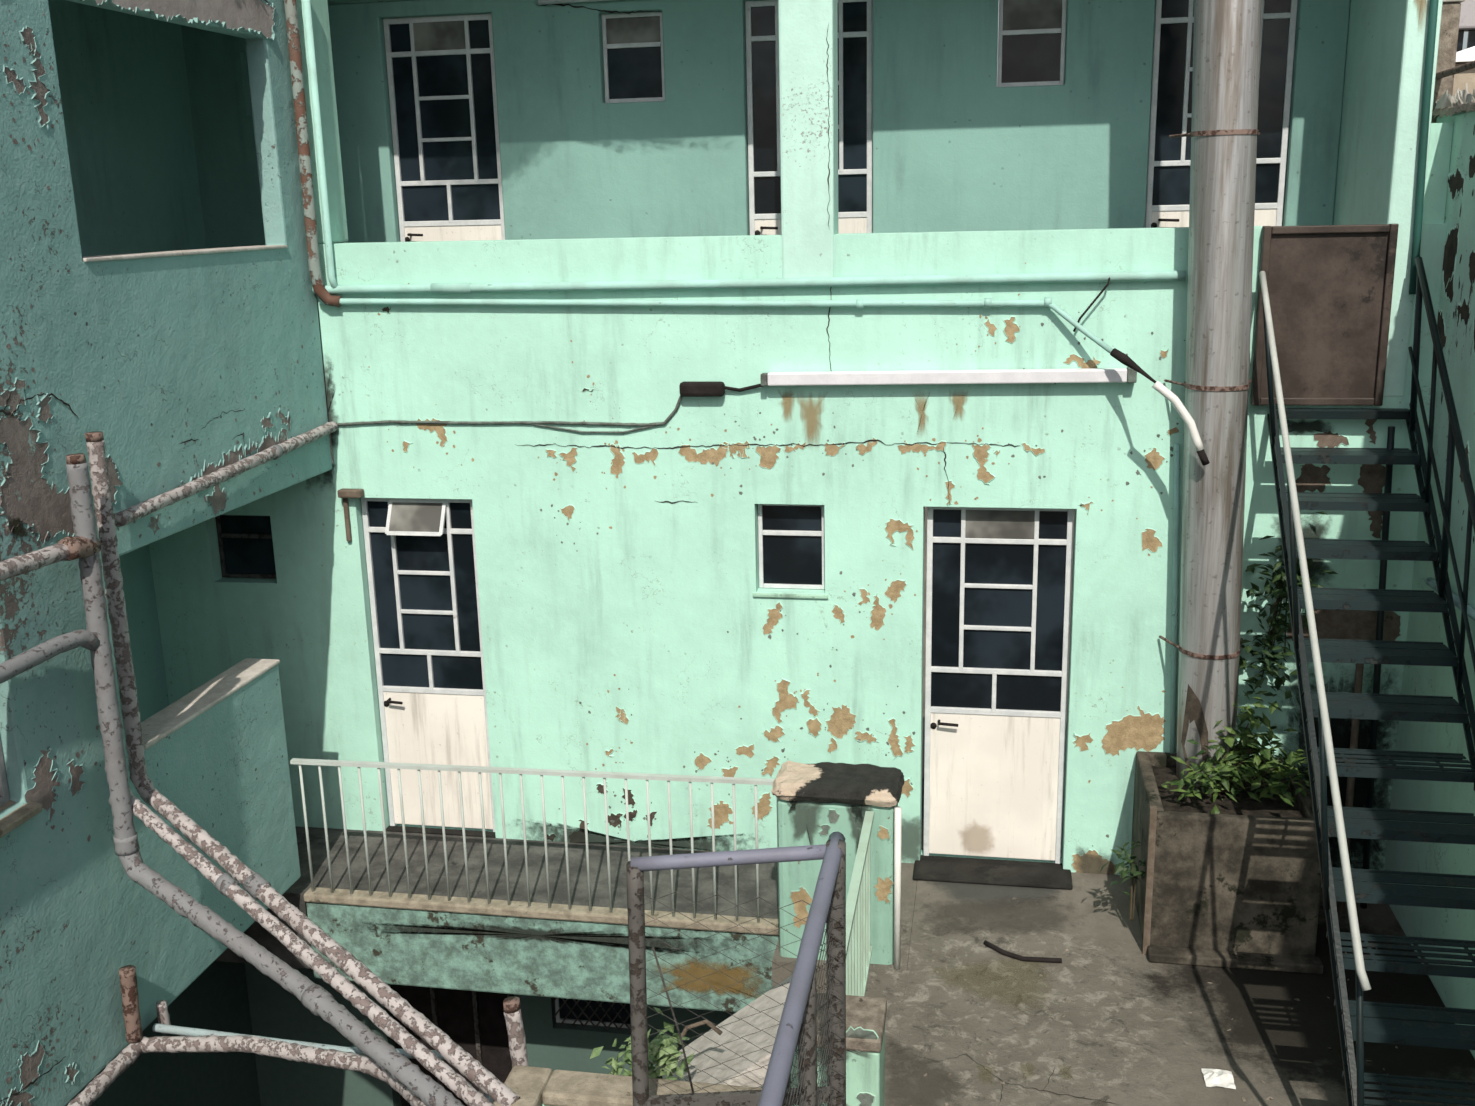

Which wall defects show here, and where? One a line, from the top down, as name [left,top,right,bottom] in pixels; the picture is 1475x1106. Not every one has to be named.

spalling [79,0,275,41]
crack [824,24,832,226]
crack [824,288,832,370]
flaking render [0,339,75,557]
peeling [601,412,878,495]
crack [517,439,1021,505]
peeling [930,427,1046,506]
peeling [878,518,918,561]
peeling [831,571,916,640]
peeling [595,674,657,838]
peeling [683,647,916,833]
peeling [1072,705,1166,757]